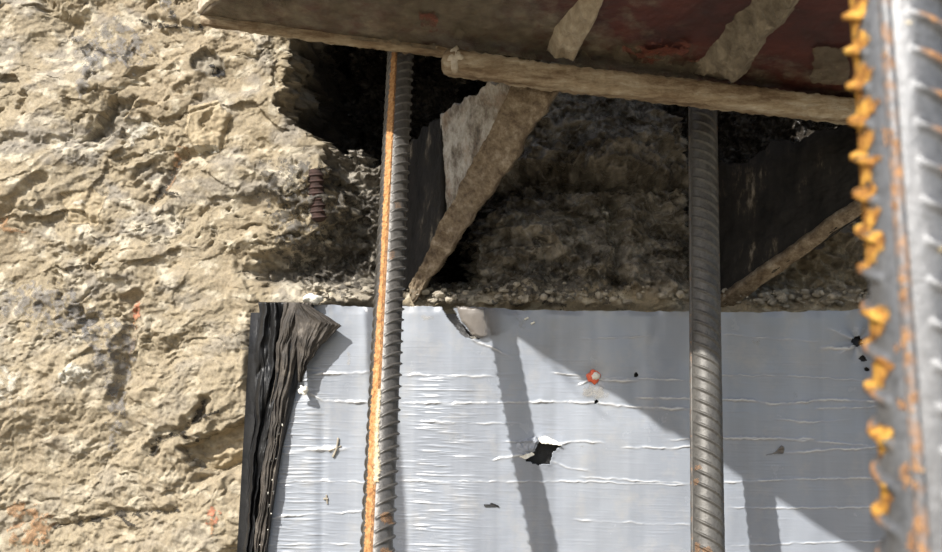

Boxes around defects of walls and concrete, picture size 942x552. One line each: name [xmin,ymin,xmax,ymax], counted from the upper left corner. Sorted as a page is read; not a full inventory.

peeling [576,49,723,83]